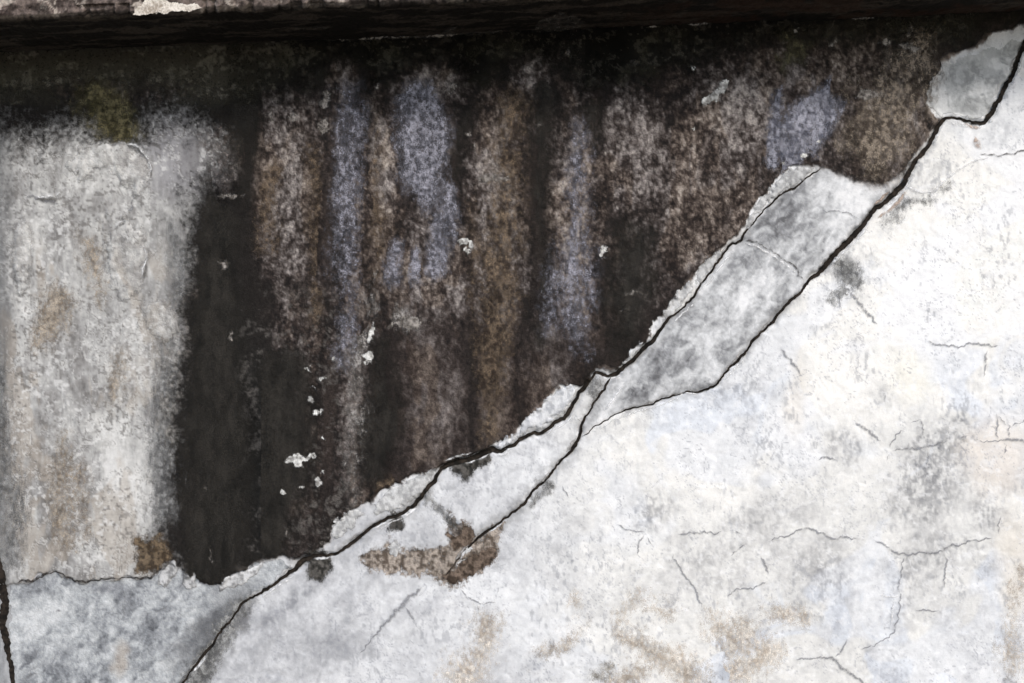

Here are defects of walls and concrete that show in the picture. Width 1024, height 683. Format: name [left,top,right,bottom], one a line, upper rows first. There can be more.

damp [882,181,951,226]
flaking render [663,250,722,321]
damp [827,258,864,304]
crack [182,40,1024,683]
flaking render [496,384,575,449]
damp [148,404,173,520]
peeling [285,453,316,467]
damp [450,453,491,482]
flaking render [321,469,436,543]
damp [387,511,405,531]
flaking render [360,511,505,588]
crack [0,559,169,683]